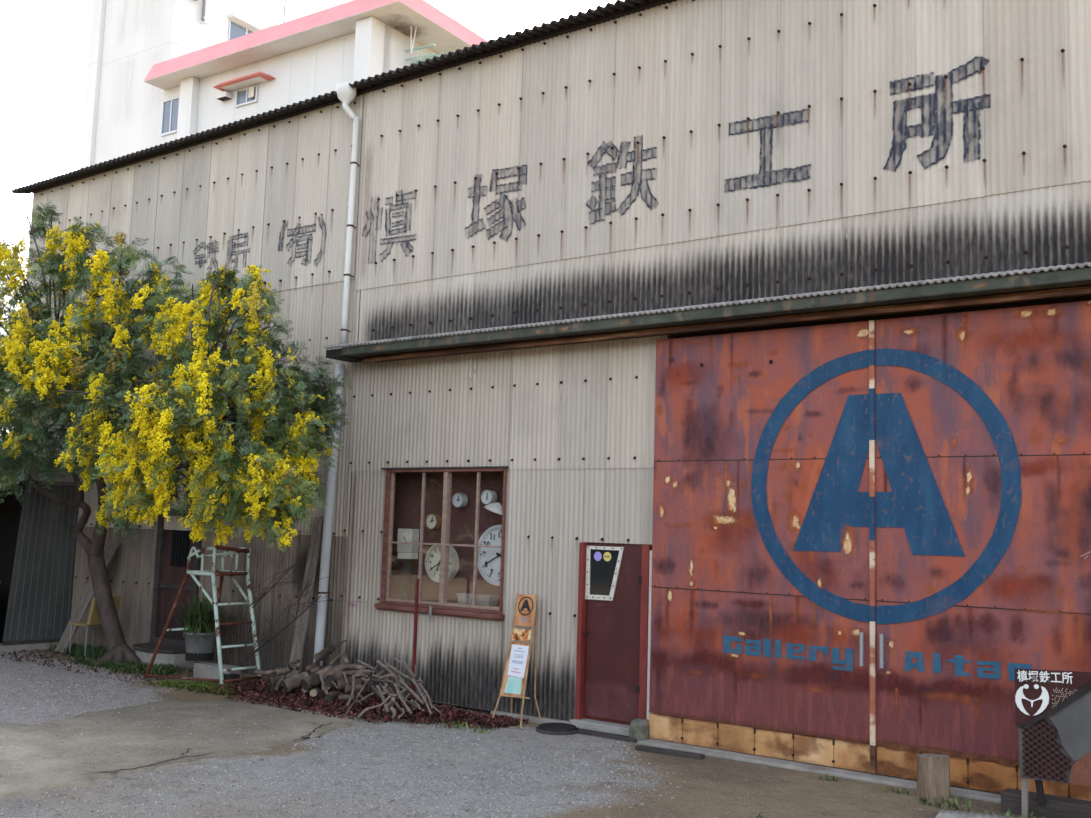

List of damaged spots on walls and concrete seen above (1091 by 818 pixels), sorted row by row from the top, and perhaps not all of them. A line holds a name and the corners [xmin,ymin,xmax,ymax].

leakage [368,213,1091,345]
peeling [713,479,745,529]
peeling [842,533,853,554]
leakage [213,619,310,678]
leakage [323,633,575,721]